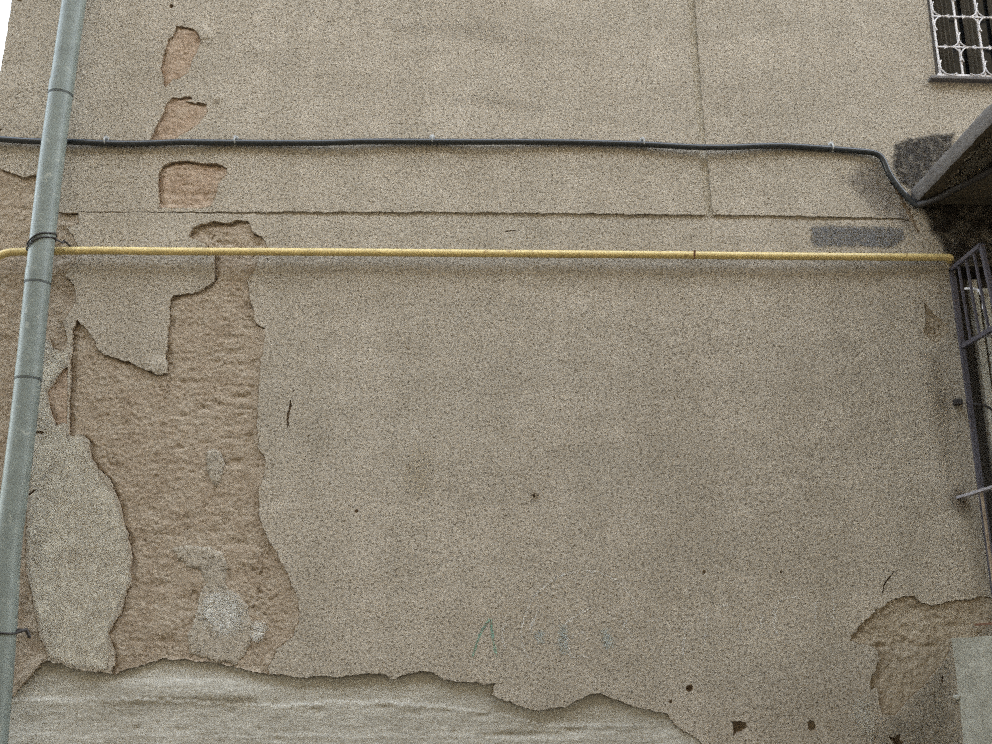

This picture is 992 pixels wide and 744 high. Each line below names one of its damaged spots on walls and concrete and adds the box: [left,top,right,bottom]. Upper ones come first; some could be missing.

spalling [160,26,201,87]
spalling [150,96,208,140]
crack [80,208,128,216]
spalling [157,160,227,208]
spalling [0,168,37,491]
spalling [924,303,948,343]
spalling [8,212,702,744]
spalling [850,595,992,715]